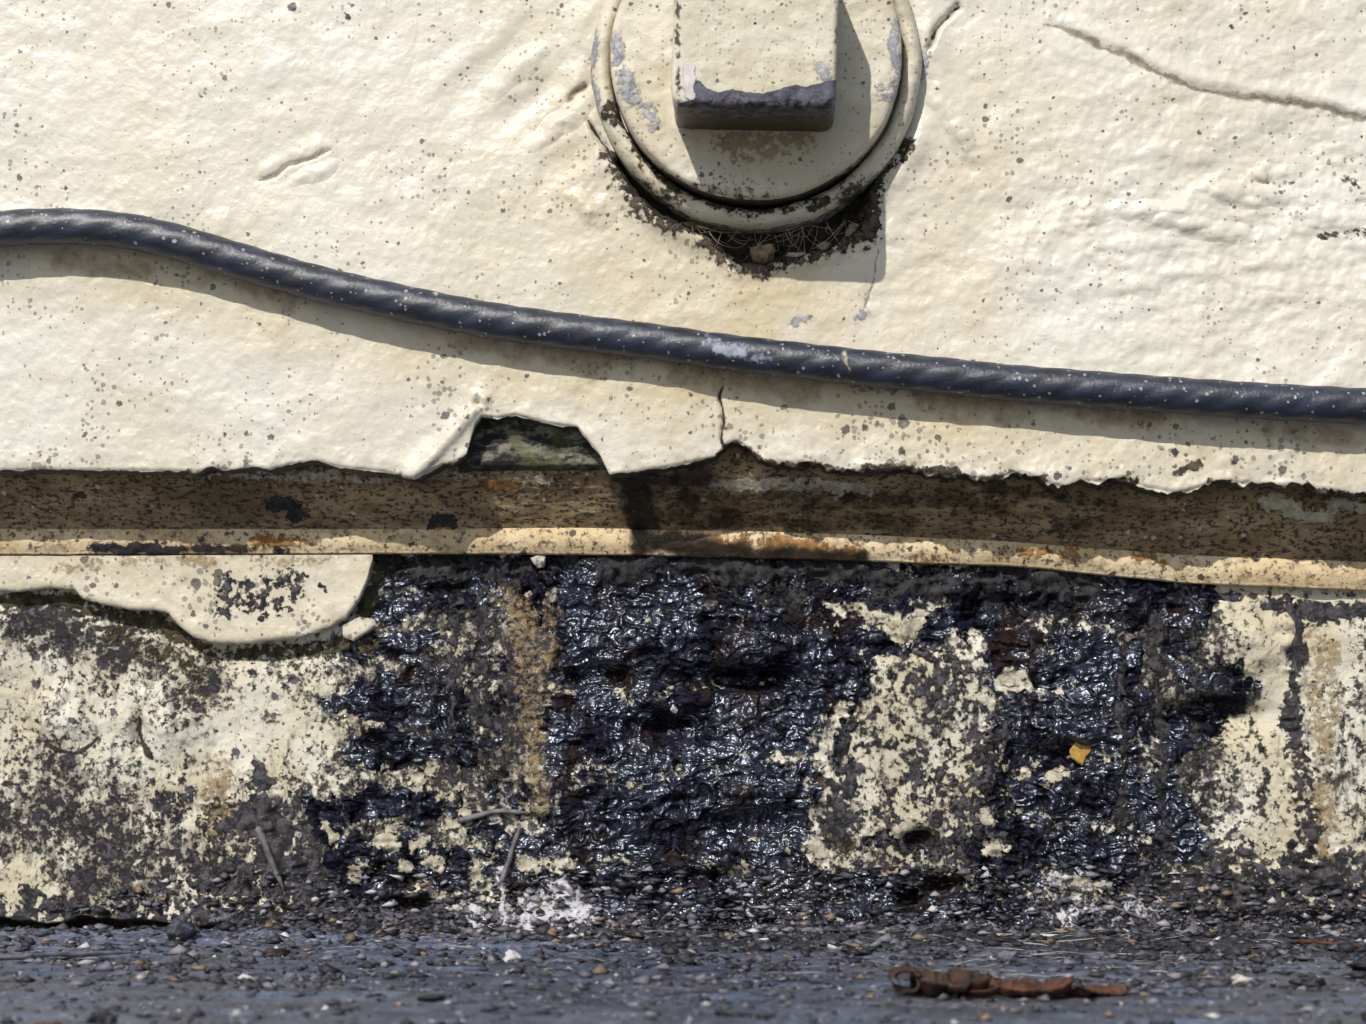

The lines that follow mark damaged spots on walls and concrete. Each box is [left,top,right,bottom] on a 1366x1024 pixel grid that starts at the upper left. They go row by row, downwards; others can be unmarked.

crack [1046,23,1366,121]
crack [259,150,328,181]
spalling [598,150,885,282]
spalling [407,388,607,489]
spalling [706,442,1048,487]
spalling [1106,475,1139,487]
spalling [1172,459,1232,486]
rust [657,529,867,555]
rust [911,549,959,565]
rust [1005,544,1084,562]
peeling [0,555,376,644]
damp [299,464,1328,935]